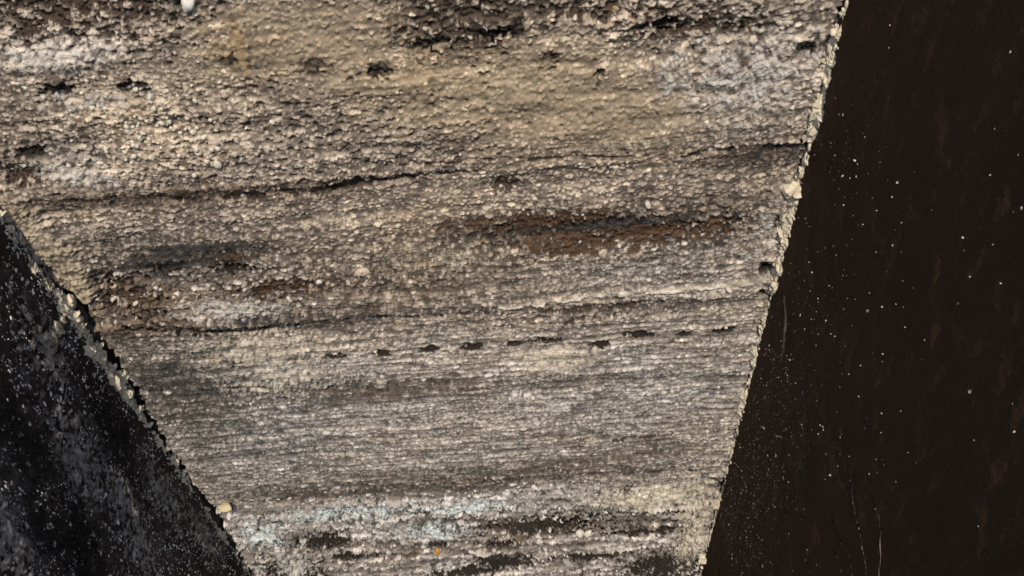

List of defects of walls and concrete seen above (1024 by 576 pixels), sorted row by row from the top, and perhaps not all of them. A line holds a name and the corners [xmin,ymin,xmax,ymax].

rust [429,205,779,270]
crack [134,314,274,334]
damp [236,498,531,576]
damp [570,471,720,573]